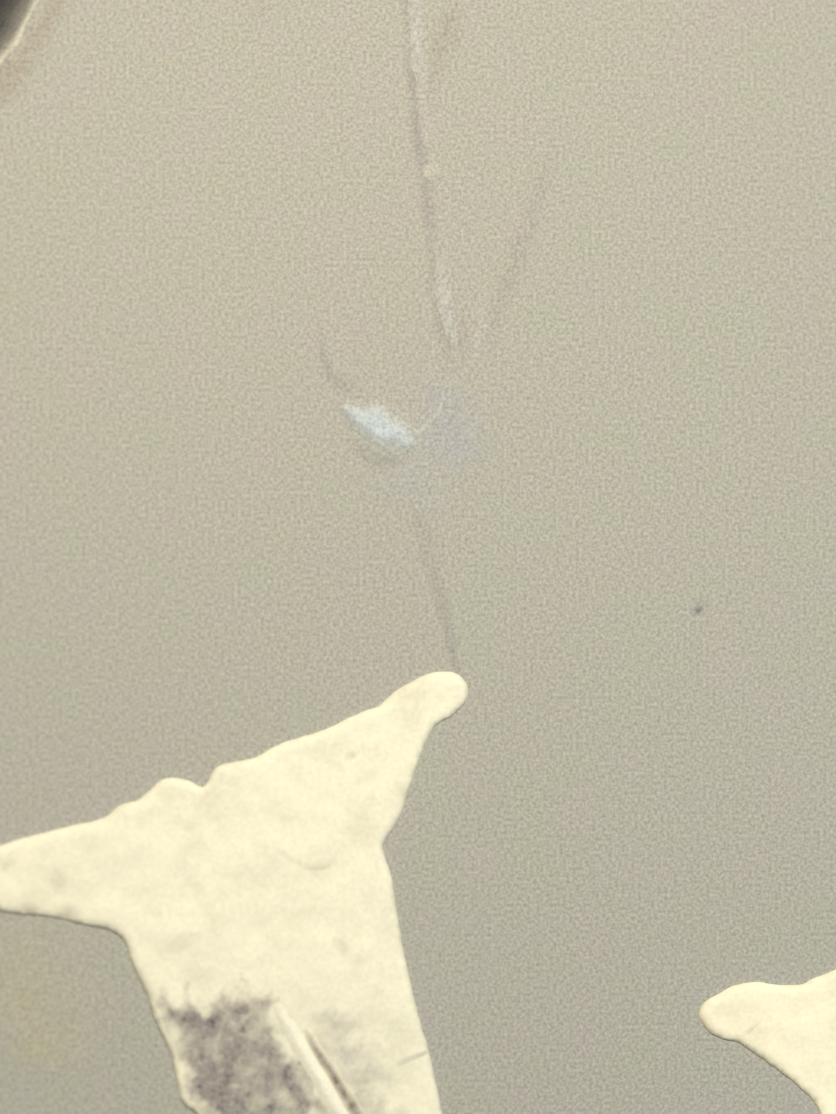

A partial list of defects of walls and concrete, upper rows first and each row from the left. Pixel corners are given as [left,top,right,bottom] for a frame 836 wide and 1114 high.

crack [409,514,466,679]